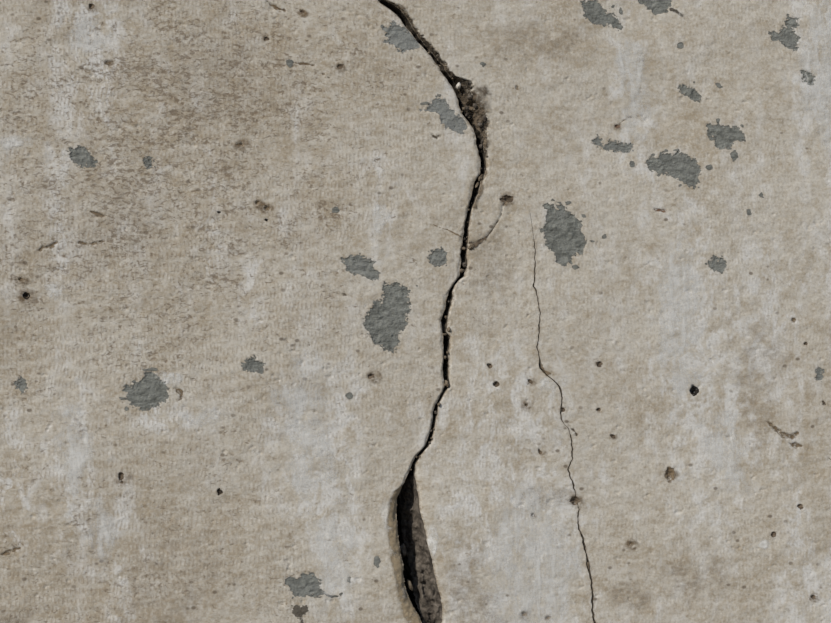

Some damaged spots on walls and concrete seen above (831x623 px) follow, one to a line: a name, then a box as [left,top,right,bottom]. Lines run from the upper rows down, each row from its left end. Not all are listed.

peeling [580,0,623,31]
peeling [638,0,682,16]
peeling [768,14,801,51]
peeling [592,134,635,167]
peeling [646,149,713,189]
peeling [706,118,747,162]
peeling [540,199,607,270]
peeling [341,253,418,353]
crack [378,0,505,623]
peeling [119,367,183,411]
crack [530,215,596,623]
peeling [285,572,343,623]